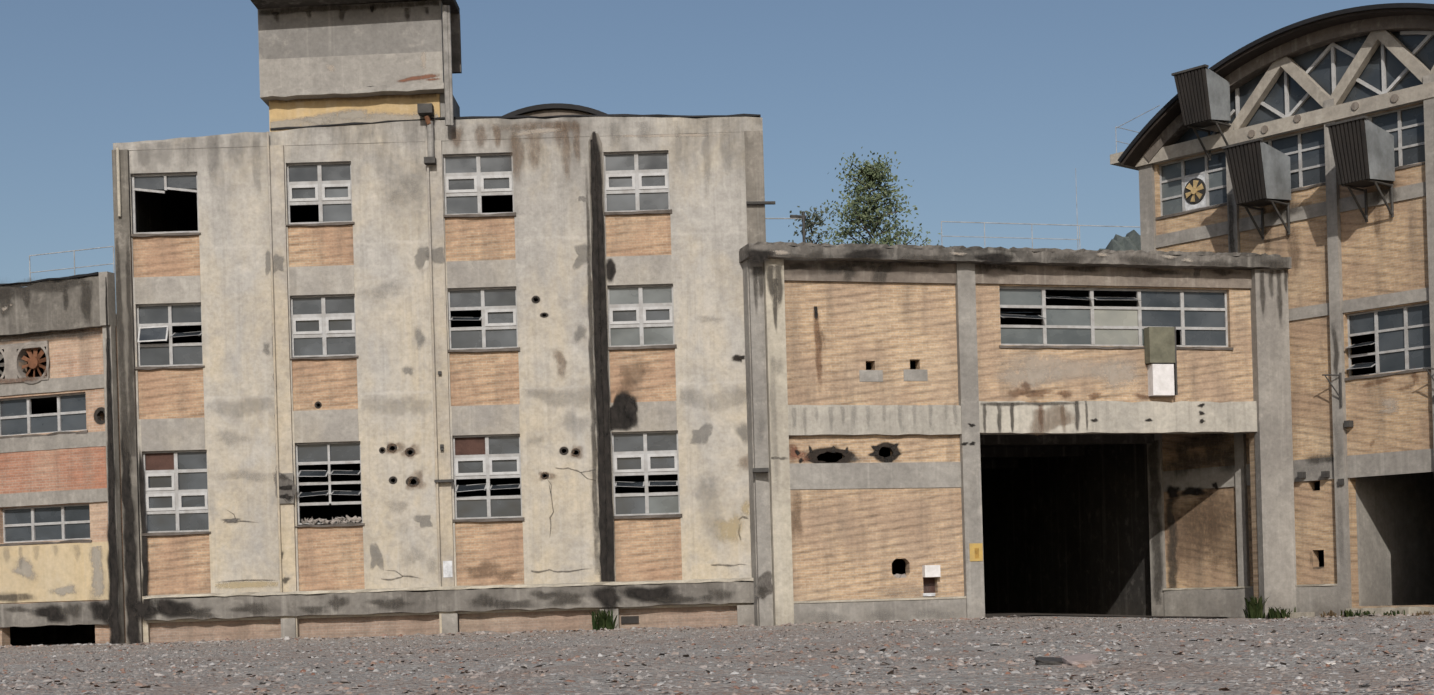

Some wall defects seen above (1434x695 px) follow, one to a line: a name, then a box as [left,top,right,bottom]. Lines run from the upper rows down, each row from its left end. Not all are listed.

leakage [1128,201,1234,276]
leakage [1063,253,1104,272]
leakage [747,249,1018,326]
leakage [1260,260,1287,316]
leakage [473,131,730,618]
leakage [0,247,212,644]
spalling [379,444,415,457]
spalling [789,442,901,463]
spalling [389,476,420,487]
leakage [303,596,345,612]
leakage [374,600,404,608]